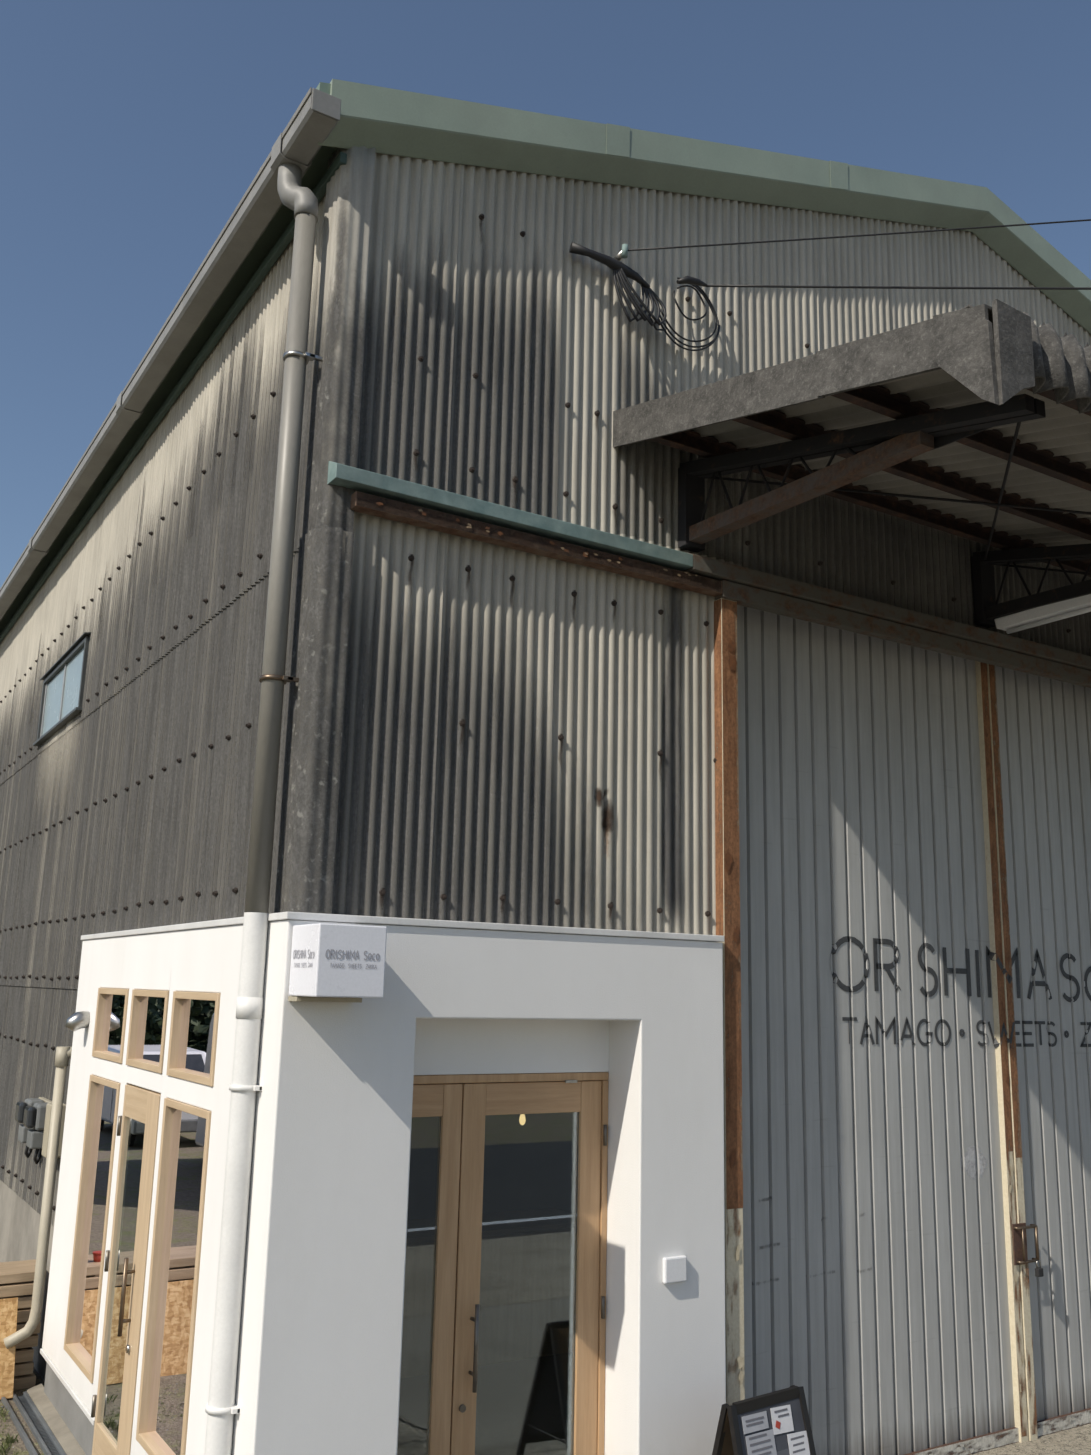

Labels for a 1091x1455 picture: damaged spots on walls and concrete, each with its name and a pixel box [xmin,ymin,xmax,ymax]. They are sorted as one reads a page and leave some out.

damp [268,212,586,928]
damp [0,361,284,1214]
damp [662,587,681,910]
peeling [1006,1152,1020,1237]
peeling [728,1356,744,1385]
peeling [916,1264,1091,1455]